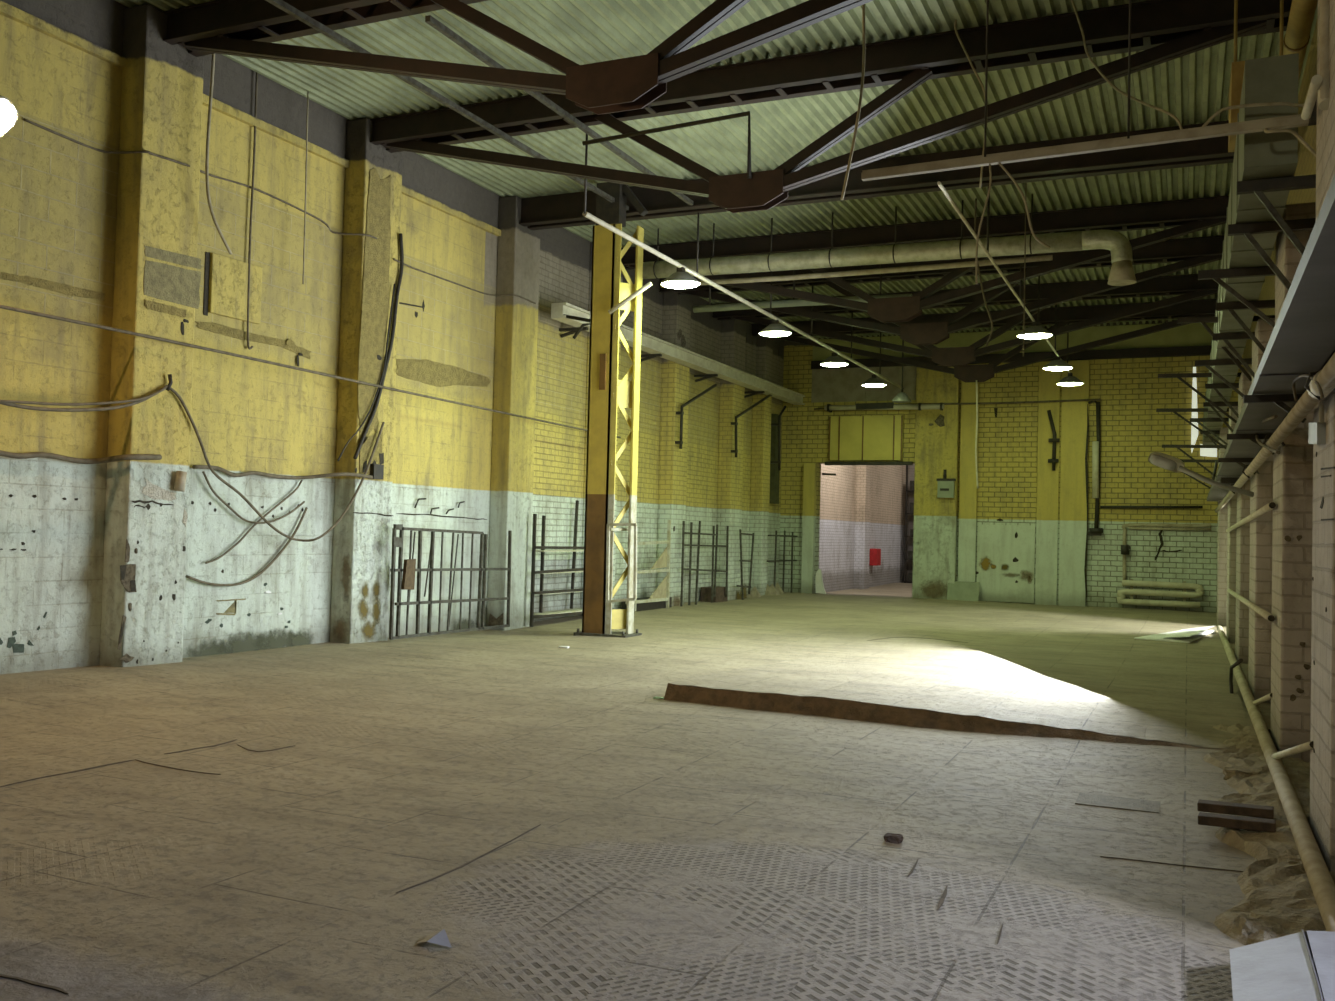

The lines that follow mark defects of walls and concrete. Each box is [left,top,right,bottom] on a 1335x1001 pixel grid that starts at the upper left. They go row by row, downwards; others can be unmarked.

rust [981,557,1032,583]
peeling [0,612,47,653]
damp [188,631,311,657]
crack [0,739,295,787]